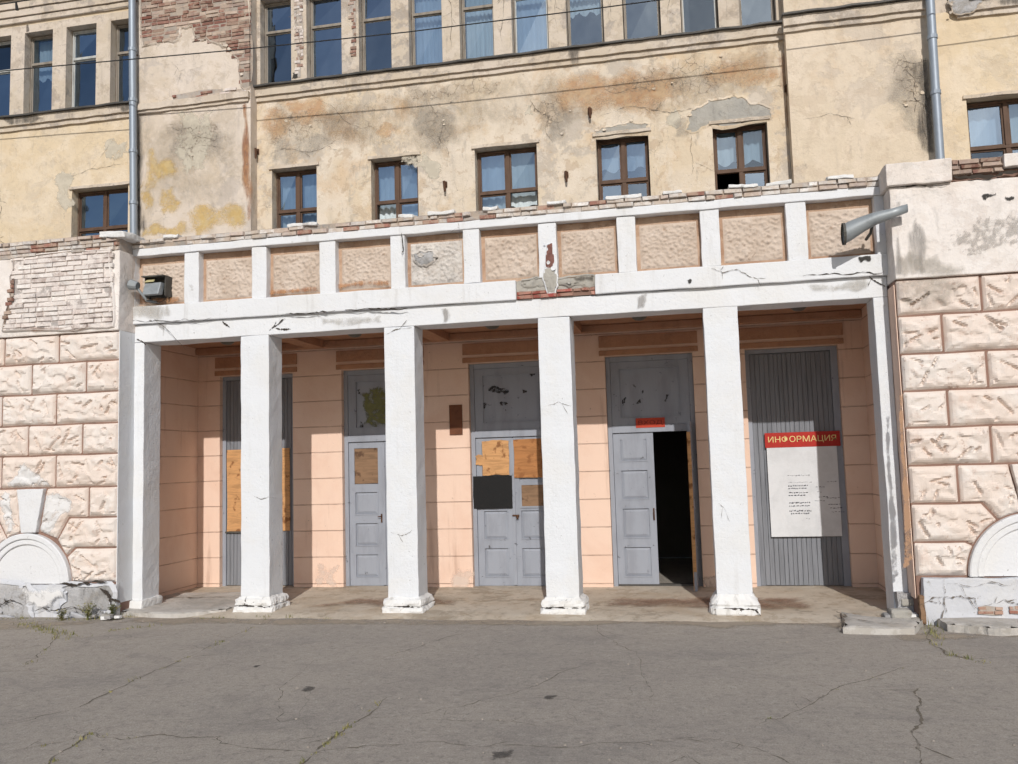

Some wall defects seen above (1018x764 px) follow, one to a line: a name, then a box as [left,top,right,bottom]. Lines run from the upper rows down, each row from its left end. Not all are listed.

flaking render [140,0,253,100]
flaking render [294,0,304,77]
flaking render [348,0,356,57]
peeling [175,111,218,175]
flaking render [594,119,651,140]
flaking render [608,53,774,134]
water stain [918,62,932,151]
flaking render [2,249,116,332]
flaking render [517,242,596,300]
peeling [483,386,509,409]
crack [0,580,121,613]
crack [157,592,270,608]